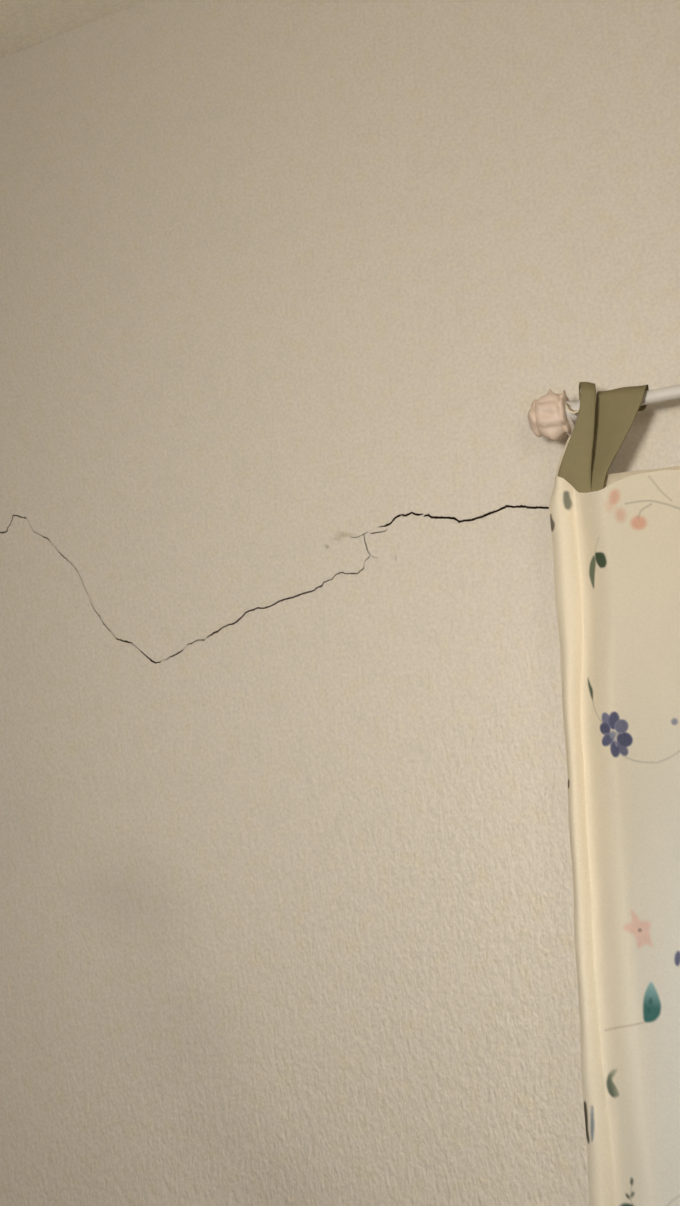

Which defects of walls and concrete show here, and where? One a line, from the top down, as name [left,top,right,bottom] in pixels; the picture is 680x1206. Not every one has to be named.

crack [0,515,68,561]
crack [95,505,549,664]